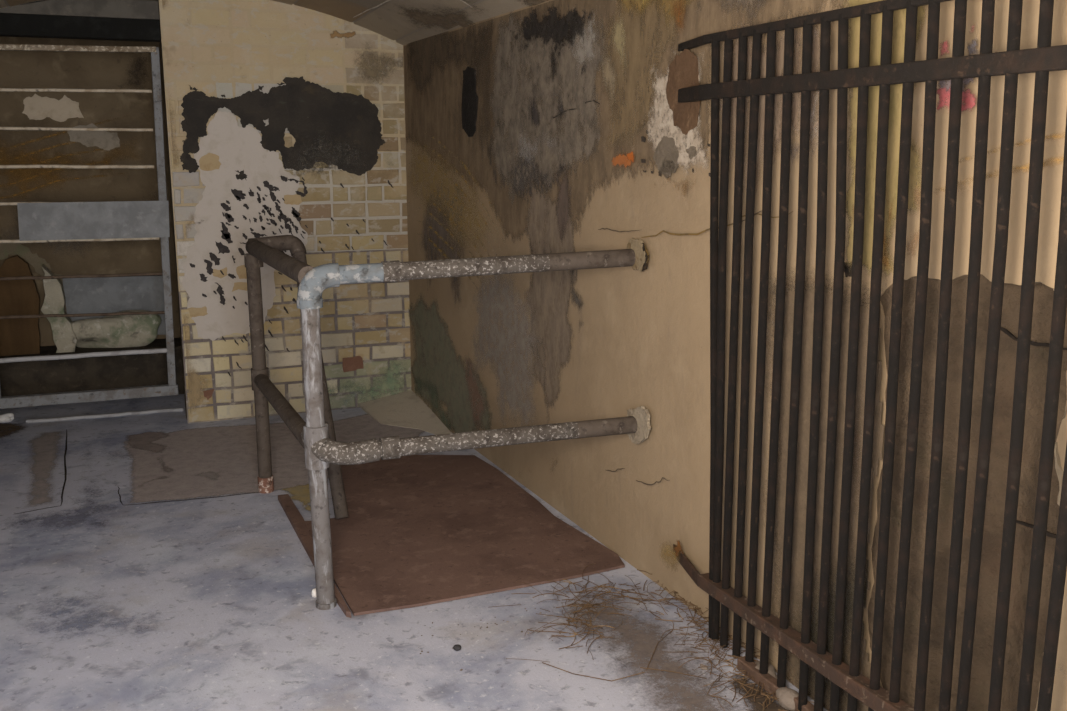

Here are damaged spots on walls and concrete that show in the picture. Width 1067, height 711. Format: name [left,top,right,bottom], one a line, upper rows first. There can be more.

leakage [359,0,848,260]
peeling [641,49,710,179]
peeling [180,76,386,341]
spalling [342,354,364,372]
leakage [526,270,582,408]
crack [16,429,67,514]
spalling [868,274,1067,711]